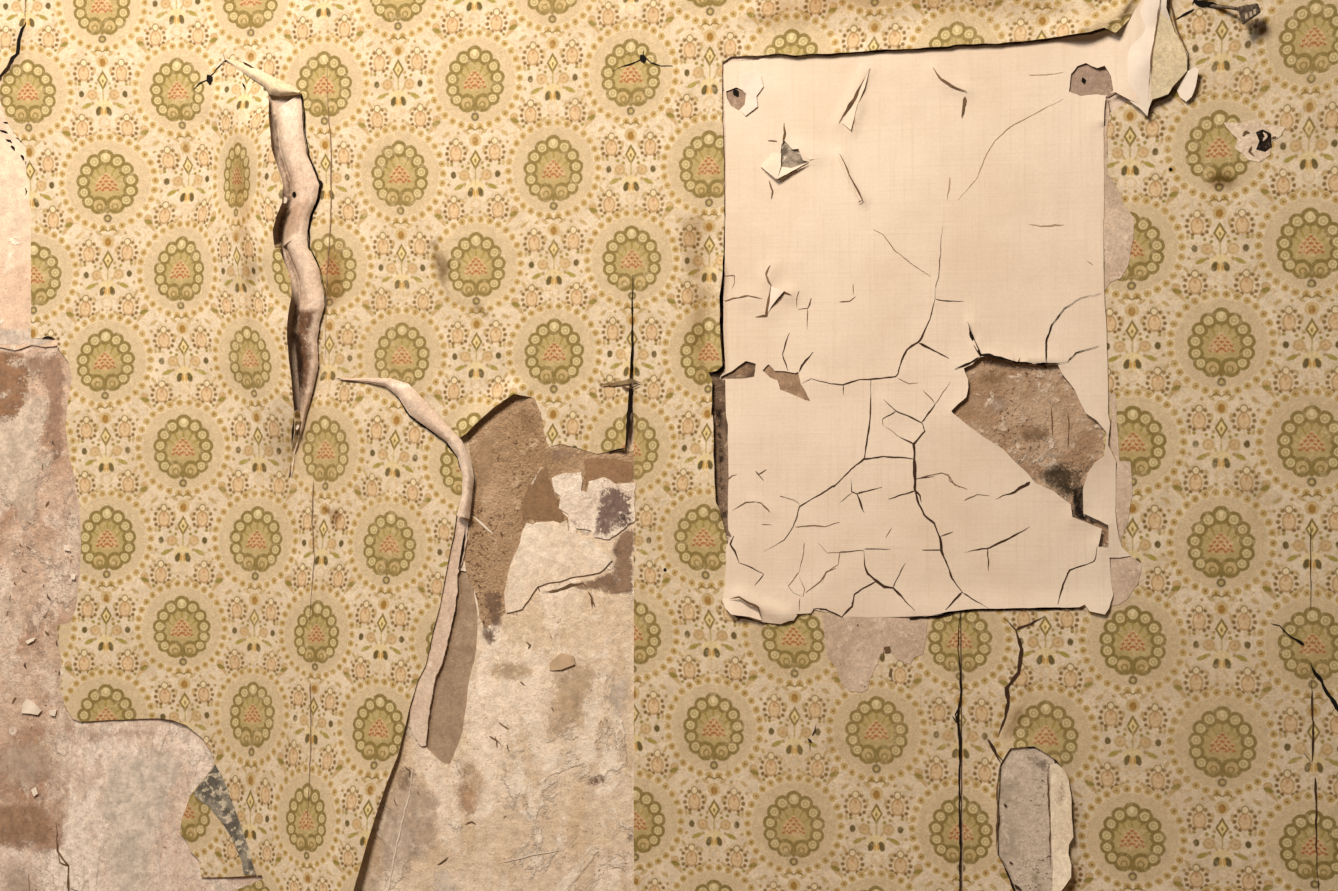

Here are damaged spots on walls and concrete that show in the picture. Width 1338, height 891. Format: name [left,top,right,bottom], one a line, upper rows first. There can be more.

crack [778,28,1108,57]
crack [947,72,1061,197]
spalling [1069,63,1116,97]
peeling [1128,0,1199,118]
spalling [0,74,247,891]
flaking render [354,394,636,891]
crack [607,274,634,453]
crack [713,201,758,374]
crack [727,231,1100,891]
spalling [952,357,1109,548]
peeling [988,741,1073,891]
crack [1271,623,1338,891]